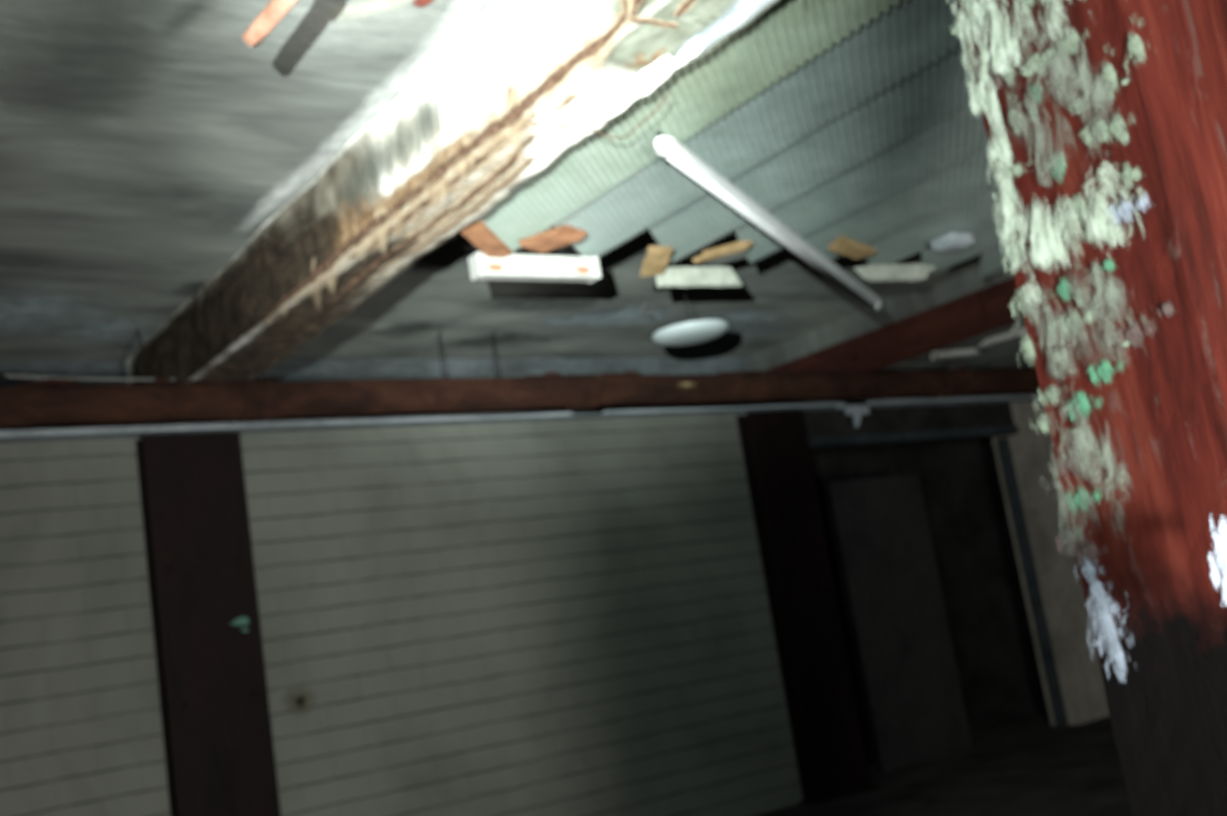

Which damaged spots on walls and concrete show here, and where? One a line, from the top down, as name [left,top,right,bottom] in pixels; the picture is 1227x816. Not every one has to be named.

leakage [346,108,440,196]
crack [265,0,696,321]